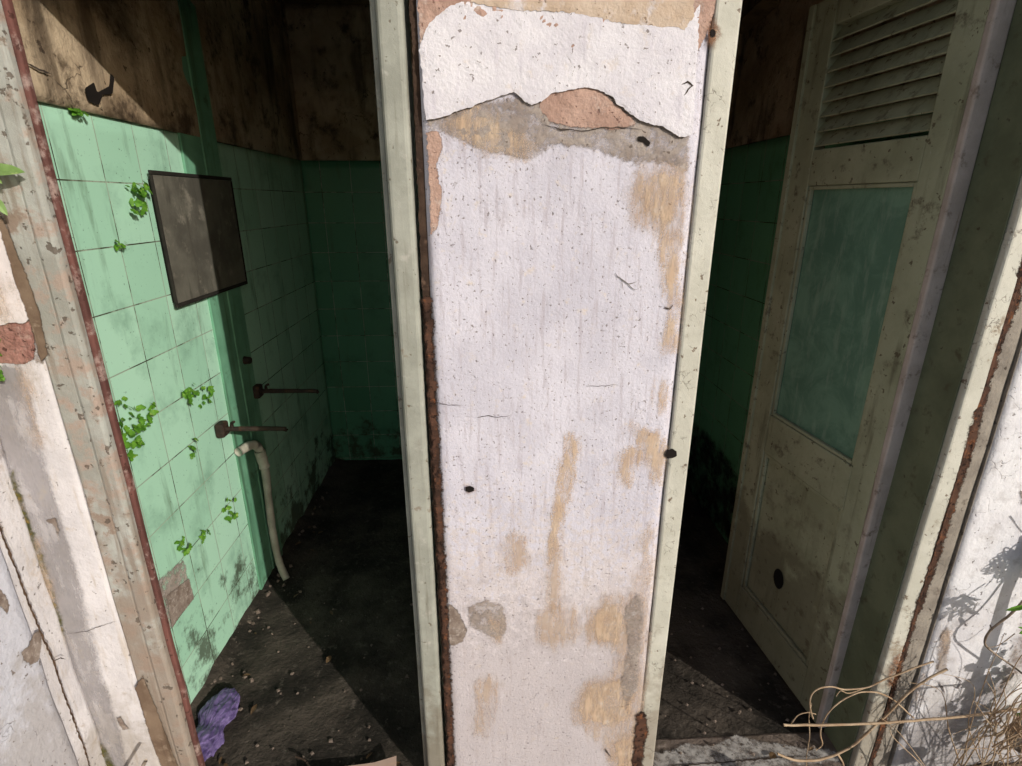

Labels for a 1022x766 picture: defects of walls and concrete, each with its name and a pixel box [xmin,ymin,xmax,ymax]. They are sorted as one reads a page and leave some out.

peeling [0,213,48,364]
peeling [417,0,716,352]
peeling [0,589,10,613]
peeling [22,631,42,665]
crack [0,526,90,766]
corrosion [420,293,456,766]
corrosion [868,259,1022,766]